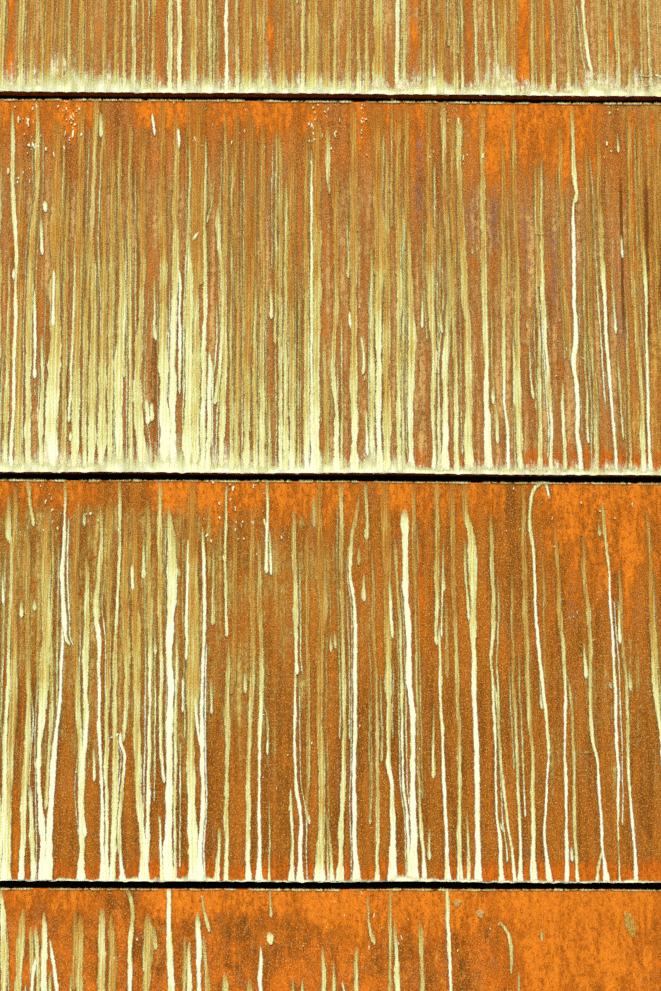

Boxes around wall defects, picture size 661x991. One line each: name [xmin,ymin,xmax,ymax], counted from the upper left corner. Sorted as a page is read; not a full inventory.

corrosion [0,100,108,145]
corrosion [132,101,325,142]
corrosion [448,103,613,208]
leakage [0,104,661,473]
corrosion [147,481,359,537]
corrosion [377,482,507,538]
corrosion [523,441,661,472]
corrosion [523,483,661,627]
leakage [489,482,661,882]
leakage [0,485,483,991]
corrosion [0,799,661,991]
leakage [501,923,520,991]